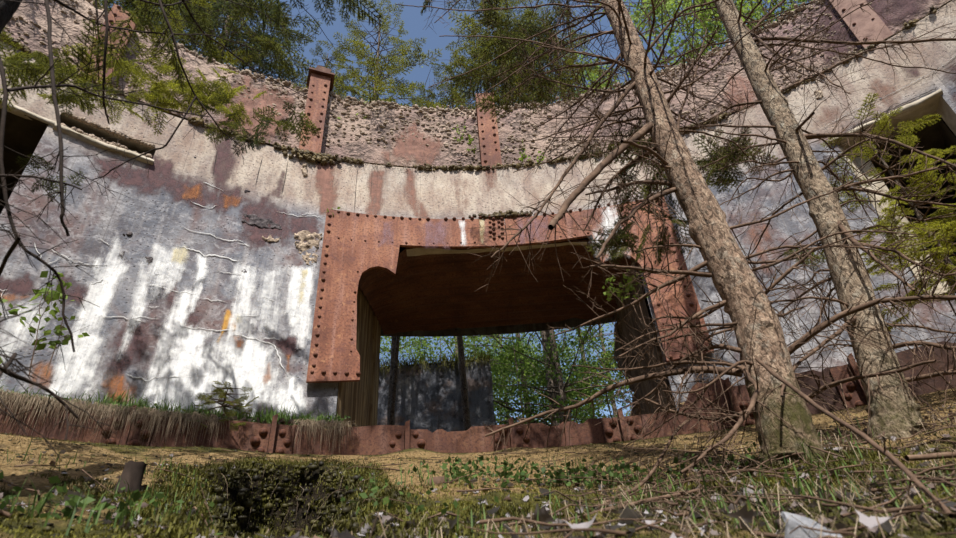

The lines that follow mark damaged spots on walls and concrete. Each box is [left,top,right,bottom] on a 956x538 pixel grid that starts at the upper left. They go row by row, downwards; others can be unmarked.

spalling [241,213,282,243]
spalling [294,230,323,265]
corrosion [316,161,336,213]
corrosion [366,171,384,215]
corrosion [406,169,445,245]
damp [49,241,313,419]
corrosion [103,375,135,403]